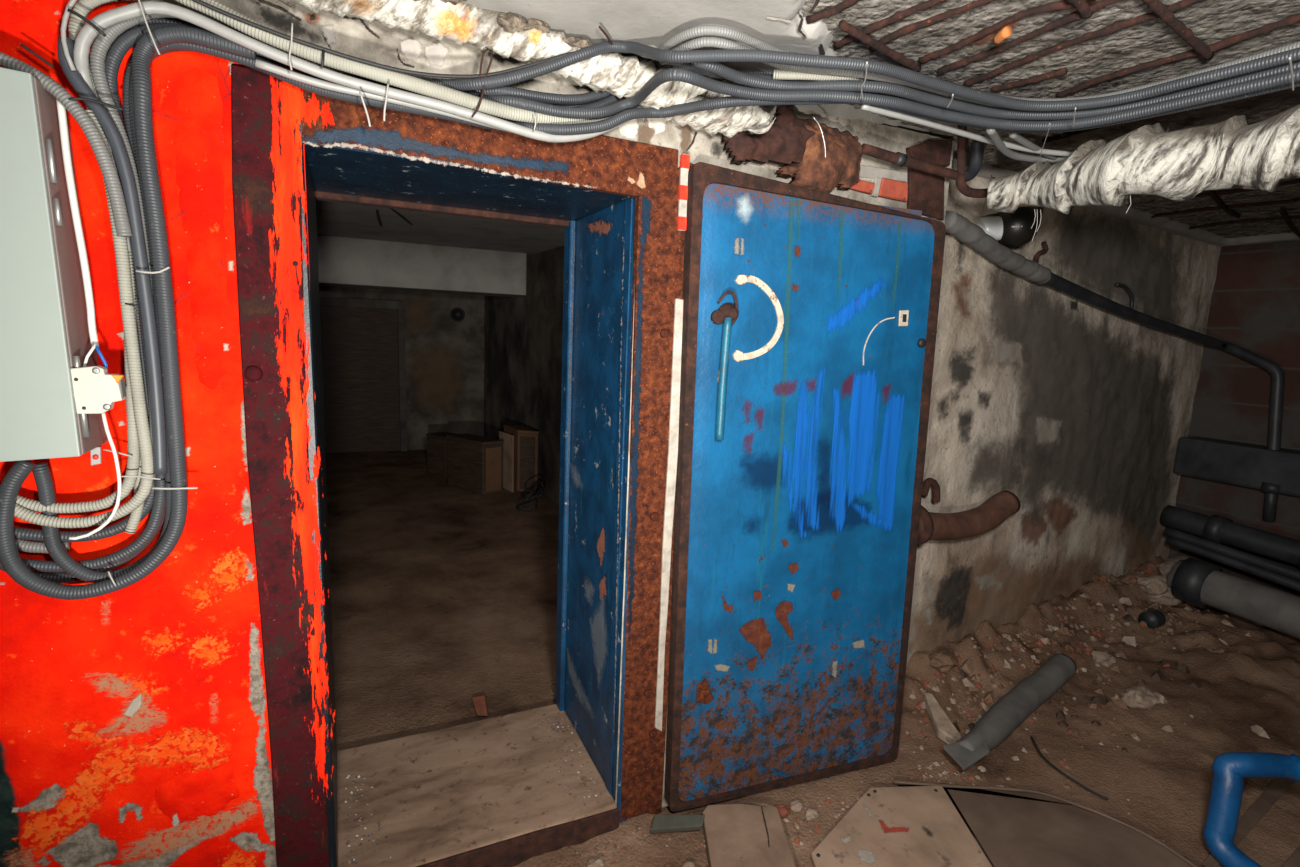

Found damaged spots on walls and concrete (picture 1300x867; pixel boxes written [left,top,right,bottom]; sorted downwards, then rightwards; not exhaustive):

flaking render [306,14,336,44]
flaking render [400,39,449,66]
spalling [800,0,1300,98]
spalling [849,87,1300,172]
spalling [1126,178,1300,238]
water stain [1054,212,1177,324]
water stain [940,269,1173,570]
peeling [240,489,252,525]
peeling [183,548,255,611]
rust [739,601,794,671]
water stain [916,559,1097,654]
peeling [5,623,277,867]